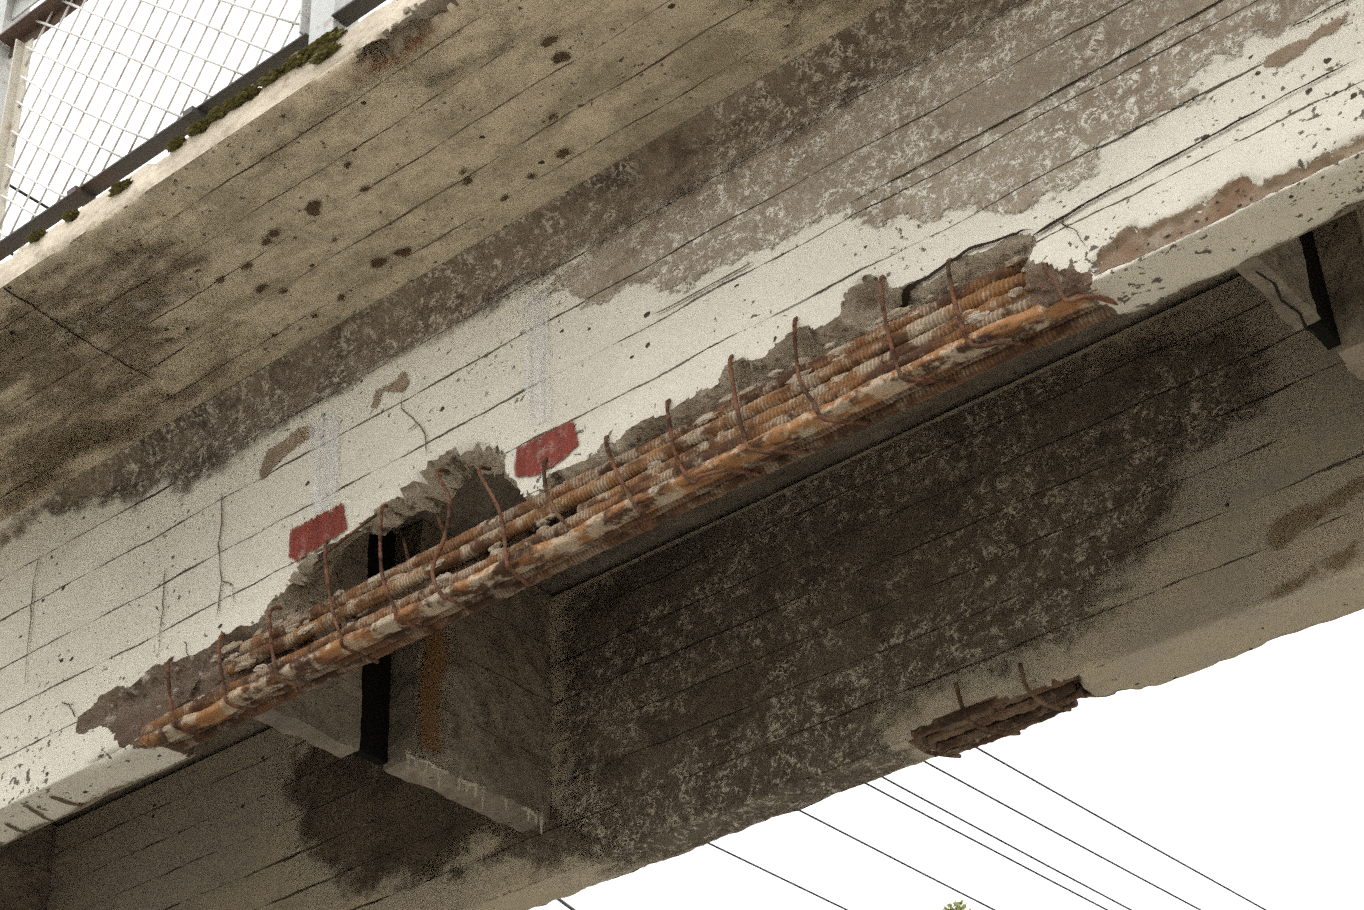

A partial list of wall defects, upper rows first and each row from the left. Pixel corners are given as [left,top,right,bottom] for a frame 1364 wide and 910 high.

spalling [356,0,459,80]
water stain [0,0,1023,547]
peeling [533,0,1349,311]
spalling [75,135,1364,757]
peeling [282,320,1268,896]
water stain [405,749,486,809]
water stain [504,798,544,834]